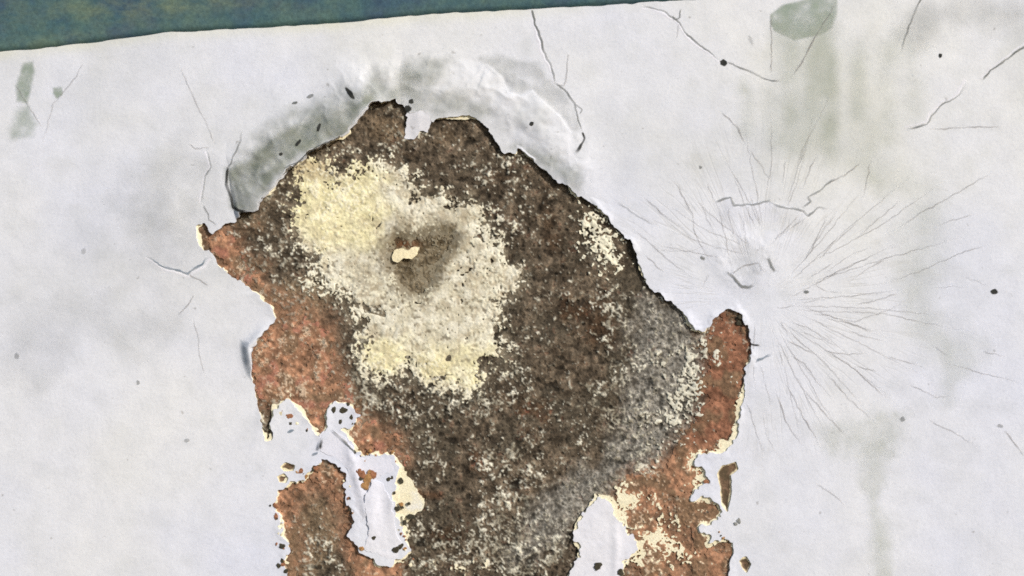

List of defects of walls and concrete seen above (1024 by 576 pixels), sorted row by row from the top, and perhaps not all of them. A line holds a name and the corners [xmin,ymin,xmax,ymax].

crack [642,8,747,70]
crack [530,10,585,151]
crack [719,197,815,216]
crack [732,259,775,288]
spalling [196,99,751,576]